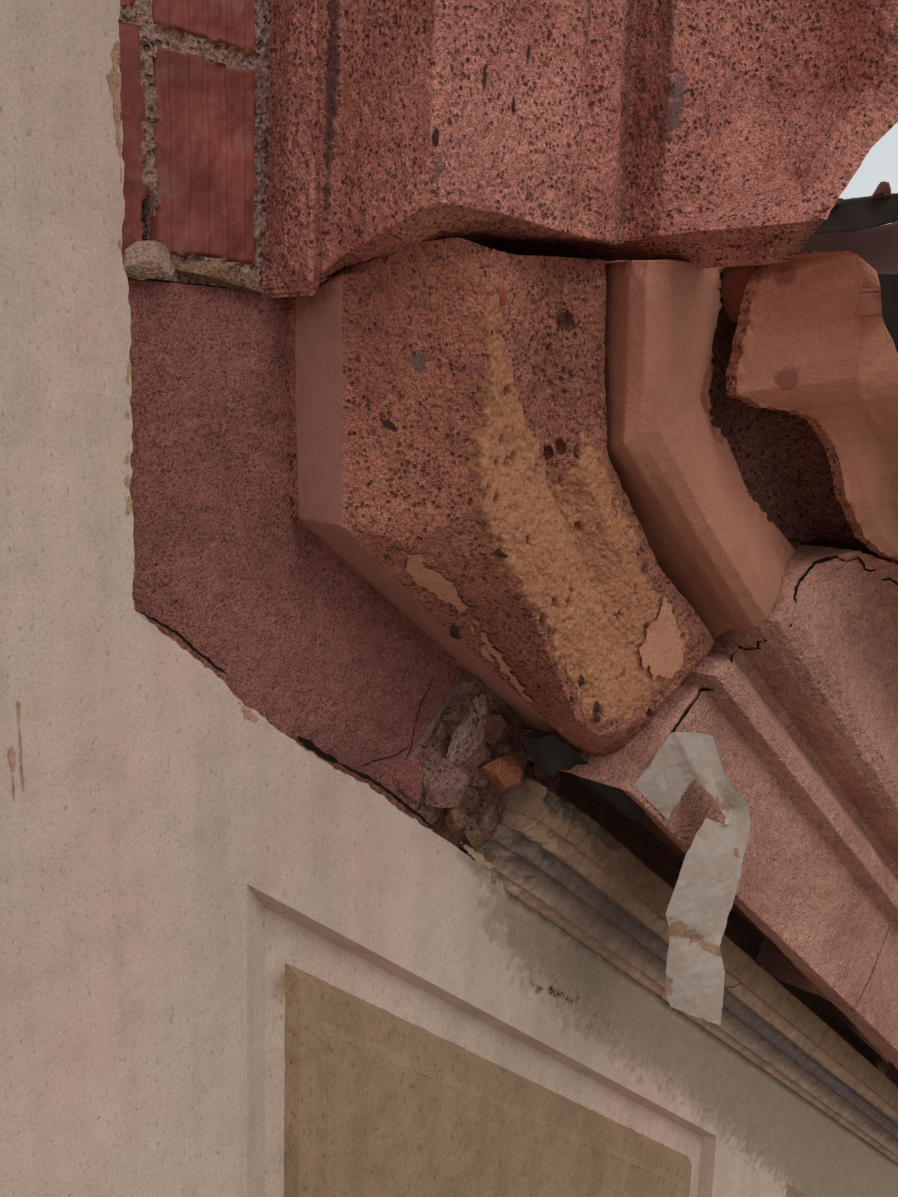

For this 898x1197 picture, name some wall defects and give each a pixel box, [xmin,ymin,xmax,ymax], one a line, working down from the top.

spalling [725,266,898,563]
peeling [401,551,533,702]
spalling [402,671,535,869]
spalling [466,310,690,725]
crack [671,688,714,733]
crack [730,555,898,663]